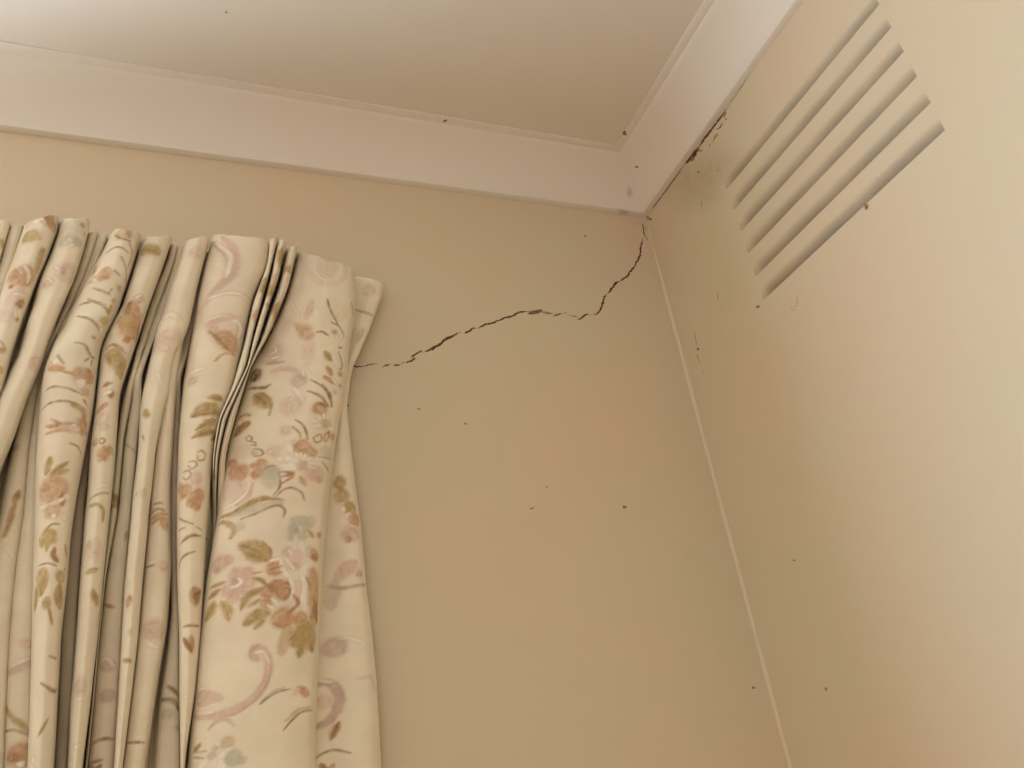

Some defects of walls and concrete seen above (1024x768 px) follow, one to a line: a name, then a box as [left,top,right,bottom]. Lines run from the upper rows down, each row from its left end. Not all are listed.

crack [354,80,746,368]